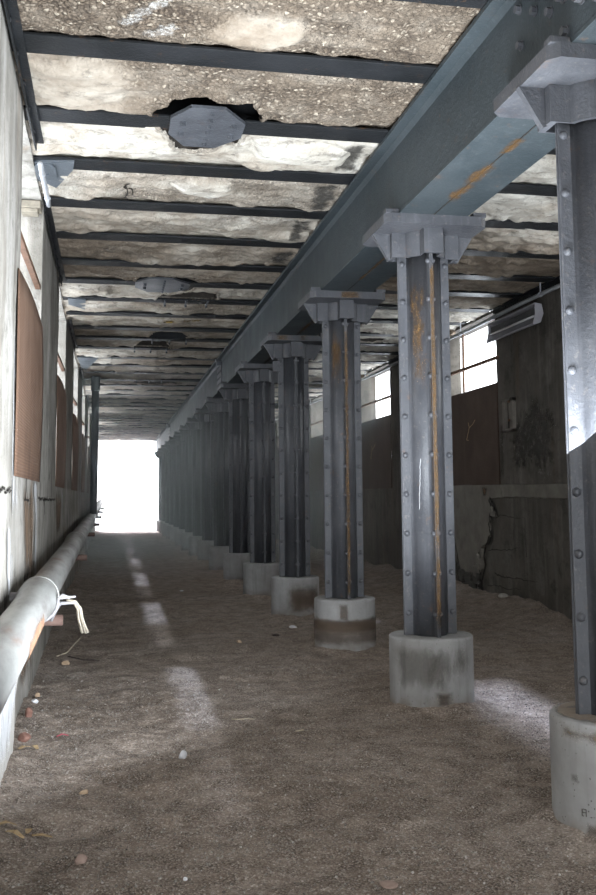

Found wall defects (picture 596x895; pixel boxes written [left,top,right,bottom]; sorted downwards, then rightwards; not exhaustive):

spalling [155,127,249,154]
spalling [143,92,270,122]
rust [434,125,537,215]
rust [411,268,441,624]
crack [0,478,55,515]
flaking render [453,483,568,590]